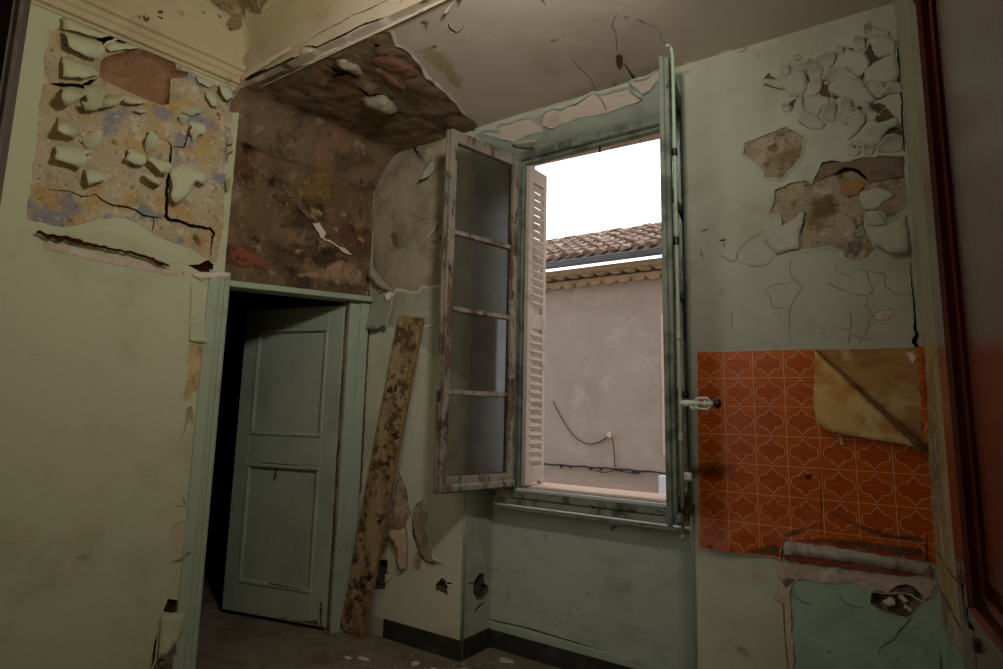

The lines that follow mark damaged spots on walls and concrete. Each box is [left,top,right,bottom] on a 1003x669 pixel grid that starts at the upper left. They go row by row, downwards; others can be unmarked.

crack [297,0,390,49]
crack [446,21,465,34]
crack [36,230,170,267]
crack [43,131,215,248]
peeling [27,0,659,443]
crack [699,227,919,364]
peeling [741,20,911,266]
peeling [359,329,370,493]
peeling [380,470,454,598]
spalling [149,613,185,669]
spalling [772,558,937,669]